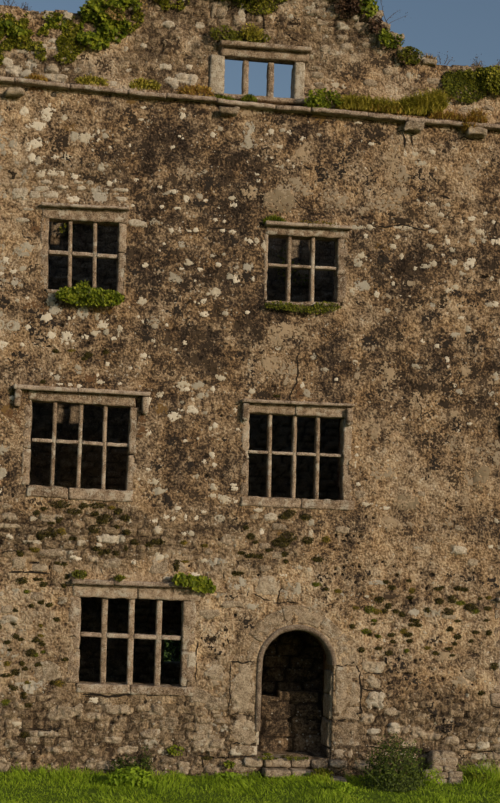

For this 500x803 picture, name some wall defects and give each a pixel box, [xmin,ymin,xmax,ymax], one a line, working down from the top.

damp [314,121,389,197]
damp [403,170,441,197]
damp [477,151,500,189]
damp [265,209,355,231]
damp [357,250,491,492]